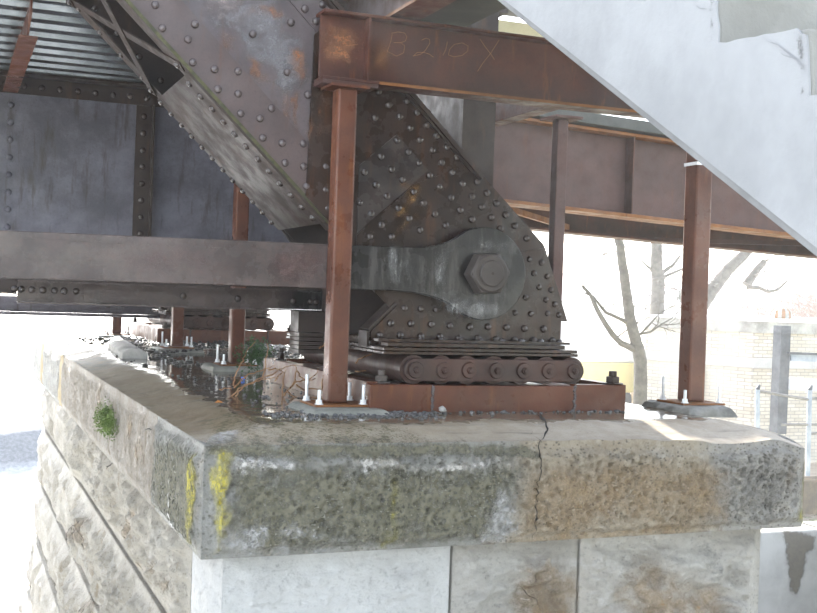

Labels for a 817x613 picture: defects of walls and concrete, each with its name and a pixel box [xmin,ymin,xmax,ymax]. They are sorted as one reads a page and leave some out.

crack [531,413,549,537]
damp [782,530,814,594]